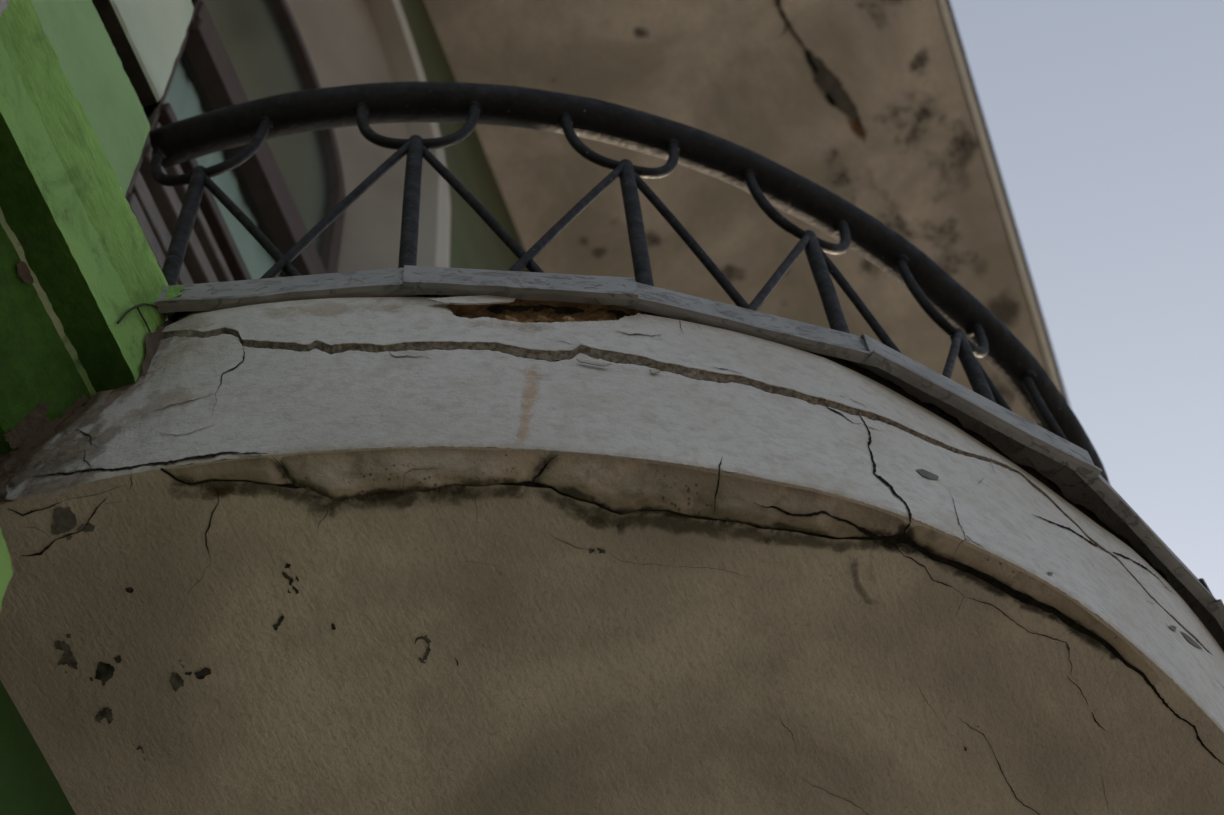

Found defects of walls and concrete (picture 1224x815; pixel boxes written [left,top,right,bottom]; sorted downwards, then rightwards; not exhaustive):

crack [775,0,804,48]
spalling [428,295,647,323]
leakage [180,464,519,515]
spalling [51,507,95,540]
crack [8,317,1224,765]
leakage [546,487,1117,659]
peeling [55,634,78,673]
peeling [90,655,122,686]
peeling [169,660,211,692]
peeling [96,707,113,724]
crack [912,677,1040,815]